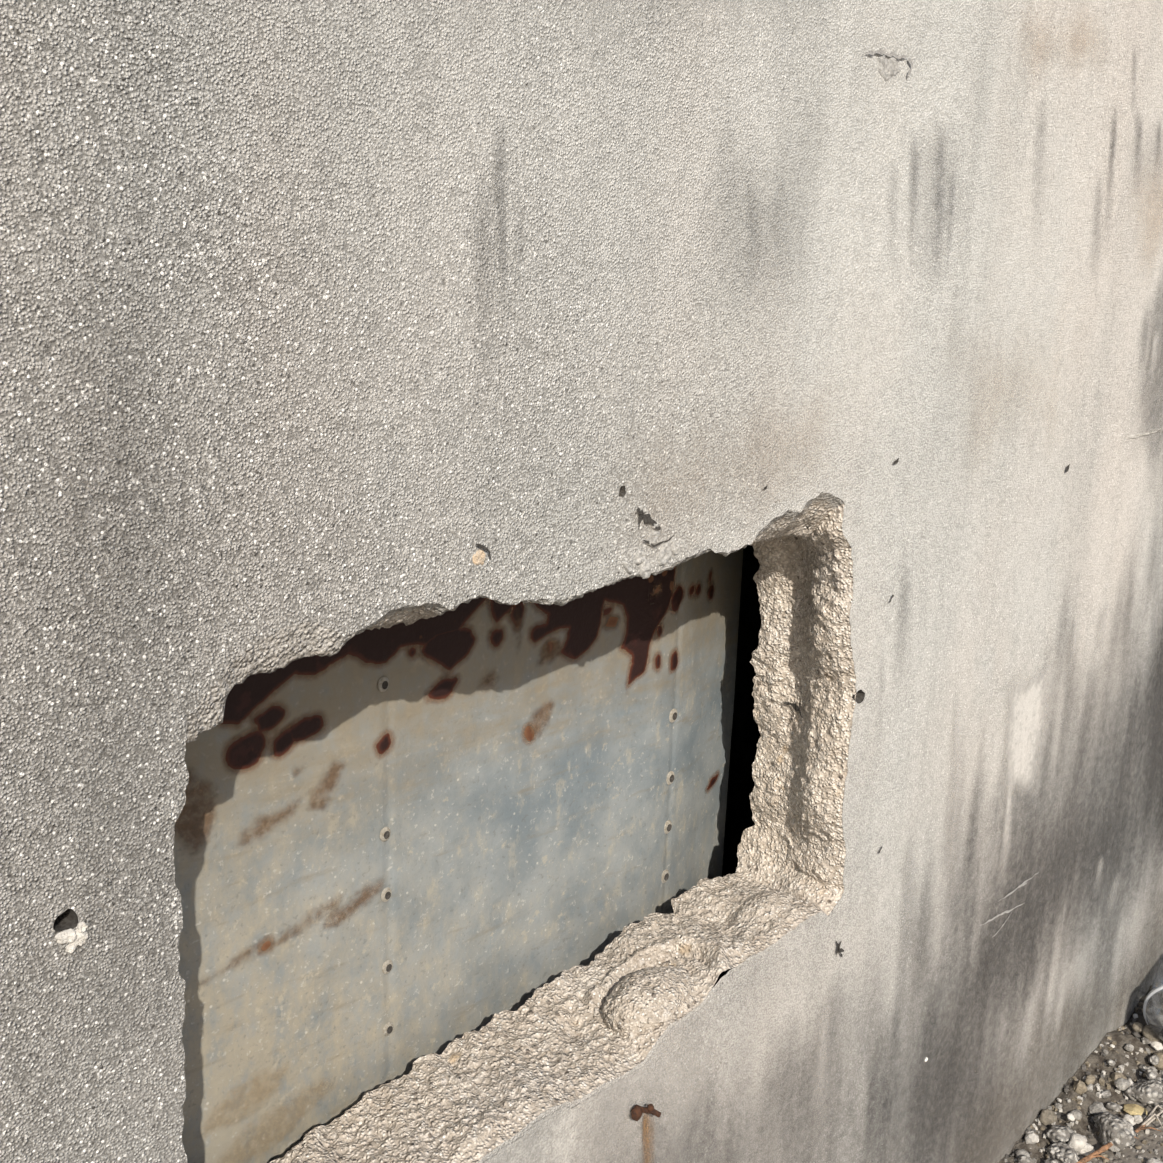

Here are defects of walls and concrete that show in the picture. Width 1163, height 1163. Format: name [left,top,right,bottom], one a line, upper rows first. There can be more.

flaking render [472,544,491,565]
flaking render [622,505,680,579]
corrosion [221,567,714,770]
corrosion [174,772,213,849]
corrosion [313,765,342,807]
corrosion [331,889,377,924]
water stain [878,626,1163,1163]